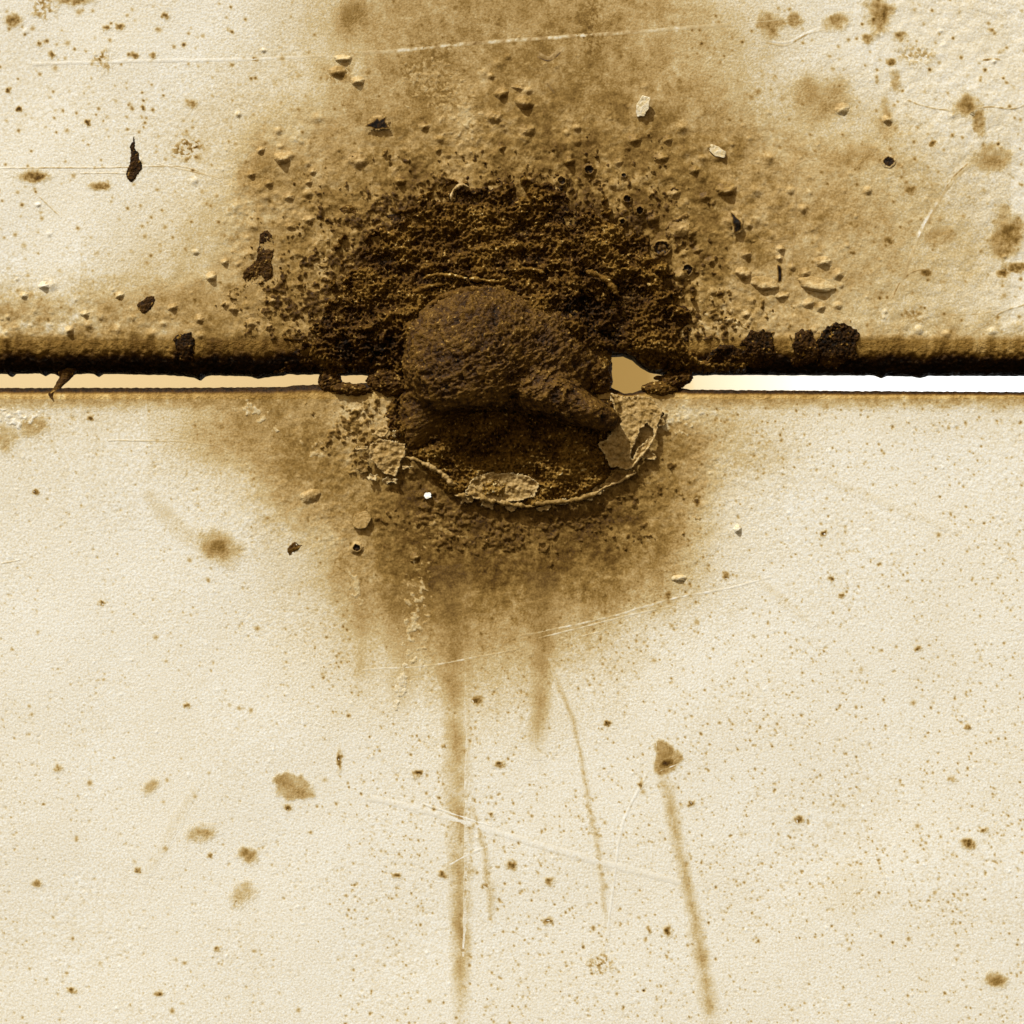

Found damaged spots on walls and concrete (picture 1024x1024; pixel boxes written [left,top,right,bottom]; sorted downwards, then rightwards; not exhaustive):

corrosion [0,0,1024,374]
peeling [355,393,667,512]
corrosion [0,399,1024,1024]